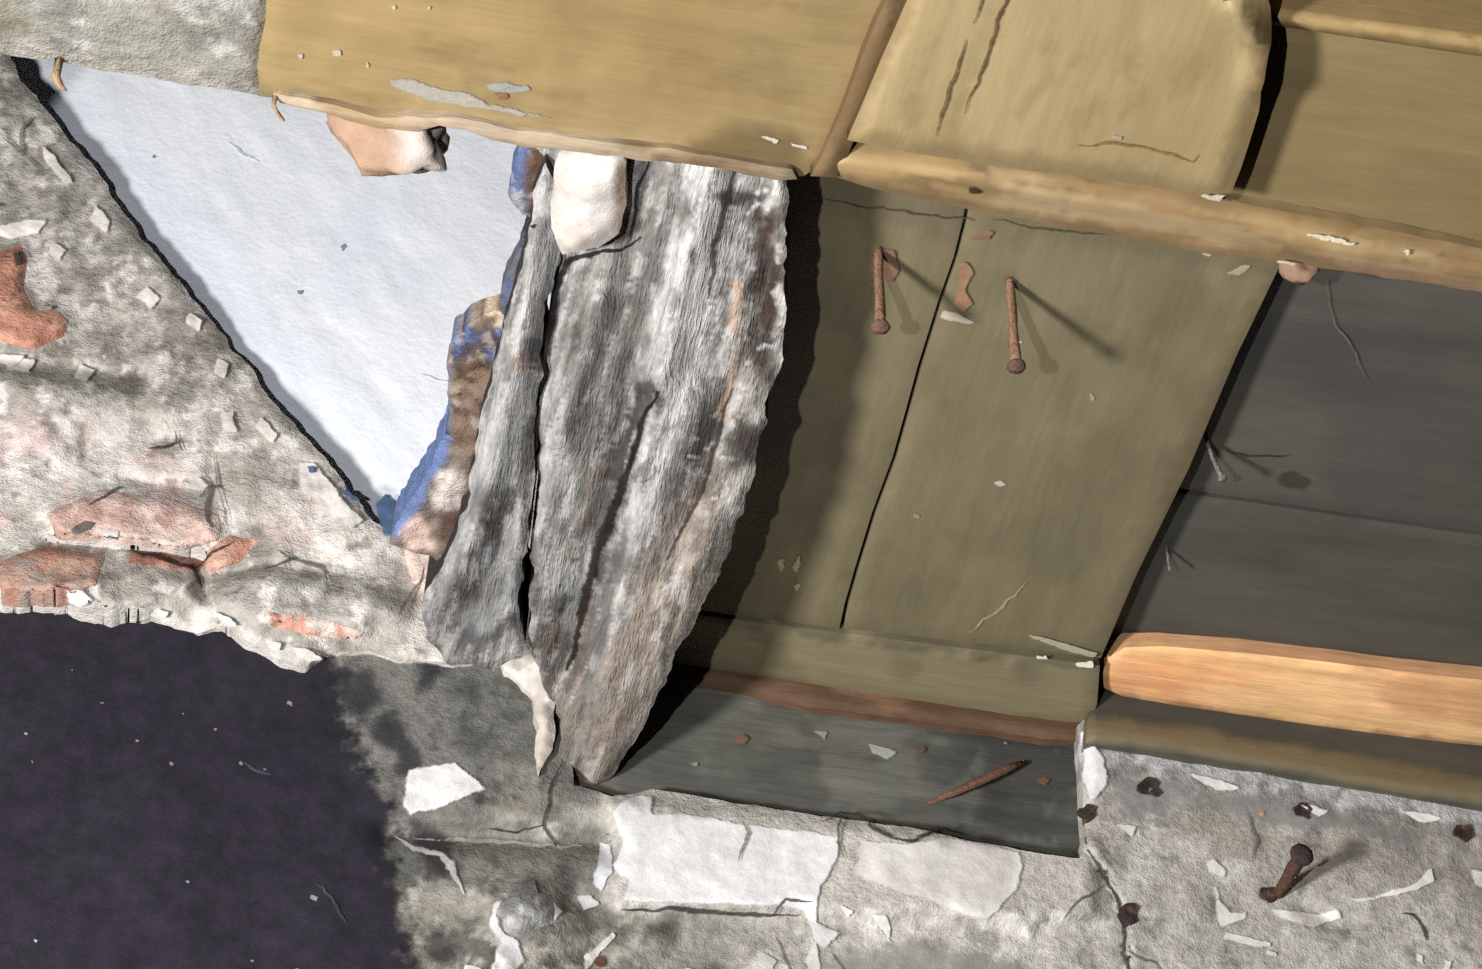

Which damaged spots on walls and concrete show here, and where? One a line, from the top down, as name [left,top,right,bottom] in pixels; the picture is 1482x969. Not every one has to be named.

crack [936,0,1008,135]
flaking render [42,147,72,183]
flaking render [89,205,109,232]
spalling [0,219,68,372]
corrosion [869,248,900,281]
corrosion [954,262,973,312]
crack [130,430,234,588]
flaking render [298,462,397,535]
spalling [0,490,261,608]
crack [264,551,327,583]
crack [825,811,958,857]
crack [1063,836,1161,969]